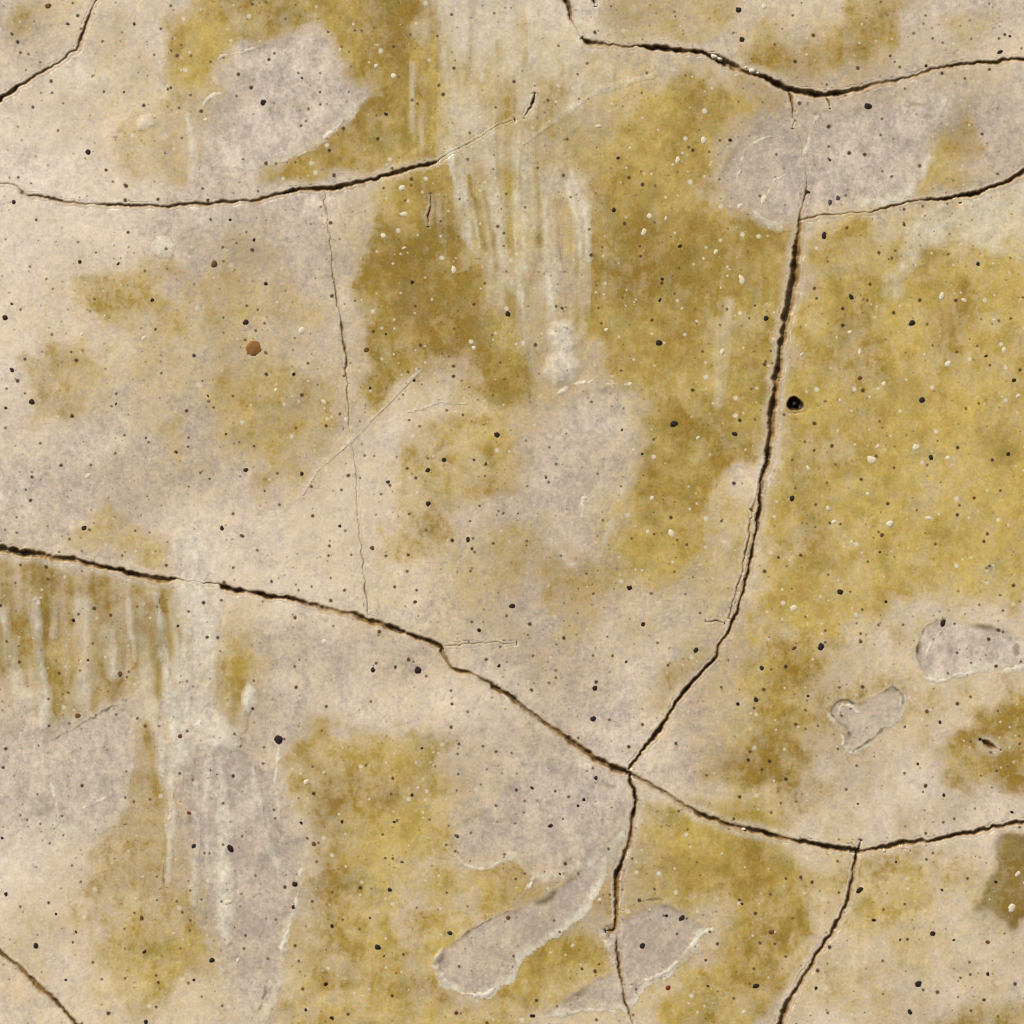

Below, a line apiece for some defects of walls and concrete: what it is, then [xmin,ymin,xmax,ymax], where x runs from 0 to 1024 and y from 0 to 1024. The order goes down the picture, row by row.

crack [560,0,1024,128]
leakage [0,495,250,1024]
crack [0,117,515,614]
leakage [268,703,540,1024]
leakage [68,0,794,657]
crack [0,542,1024,1024]
peeling [431,750,630,999]
peeling [545,896,713,1019]
crack [626,127,1024,771]
leakage [630,90,1024,1024]
peeling [826,679,906,756]
peeling [913,616,1024,684]